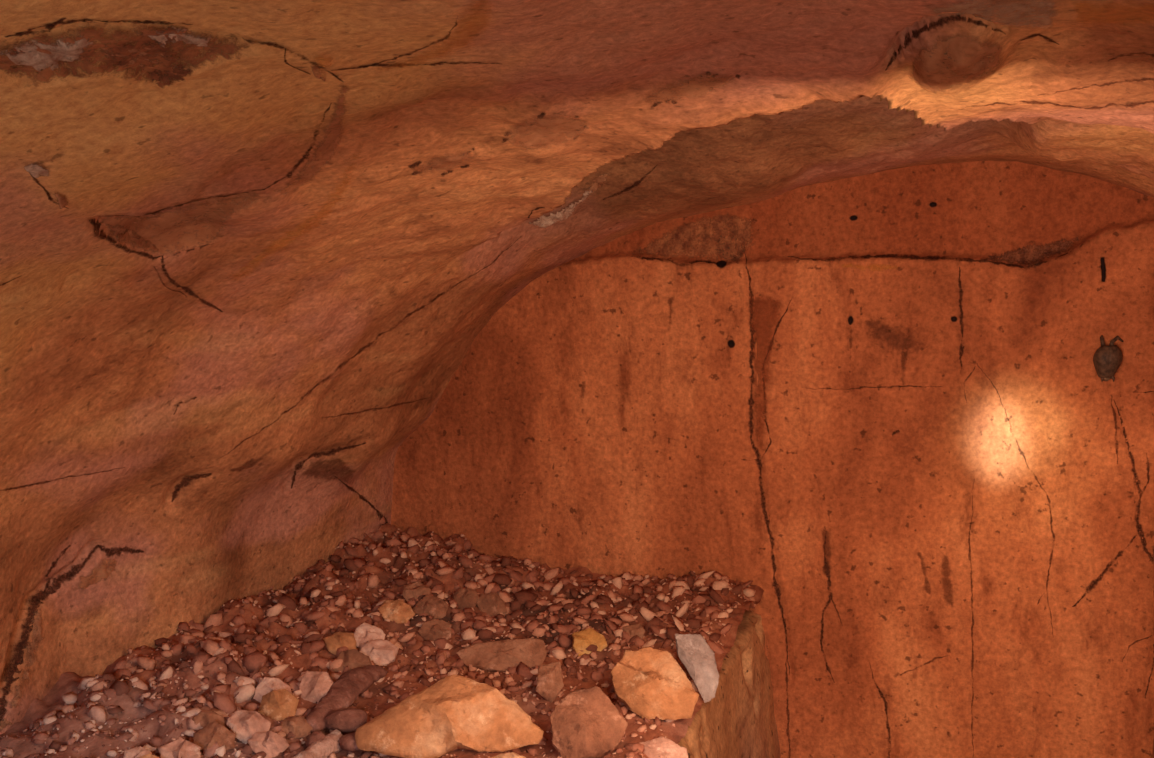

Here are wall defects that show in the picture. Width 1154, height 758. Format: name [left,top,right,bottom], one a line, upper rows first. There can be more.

spalling [0,18,248,88]
spalling [528,174,607,228]
crack [743,251,792,758]
crack [810,267,1154,634]
crack [0,545,144,729]
crack [820,526,842,683]
crack [870,496,974,758]
crack [1122,635,1154,698]